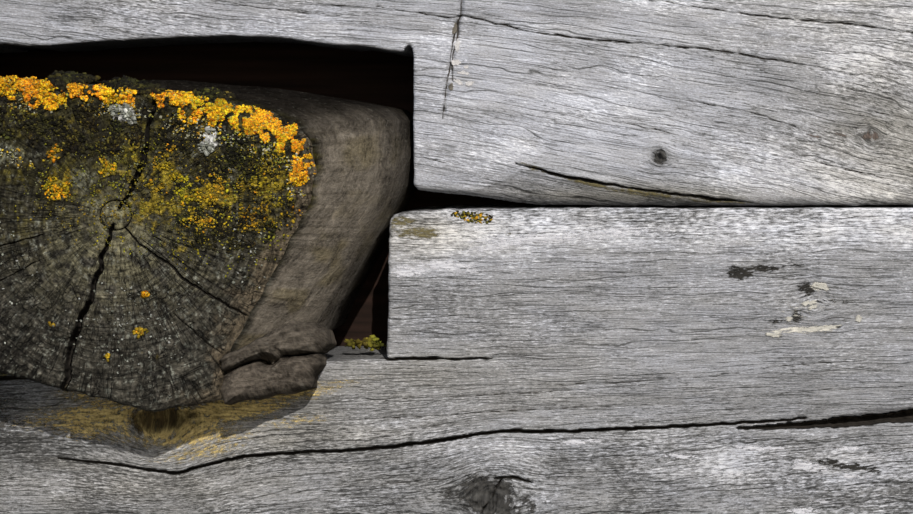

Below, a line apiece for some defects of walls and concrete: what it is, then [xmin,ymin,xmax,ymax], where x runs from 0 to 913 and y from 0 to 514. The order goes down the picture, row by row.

crack [219,0,836,81]
crack [516,163,752,203]
crack [62,99,246,392]
crack [385,354,492,362]
crack [58,379,913,474]